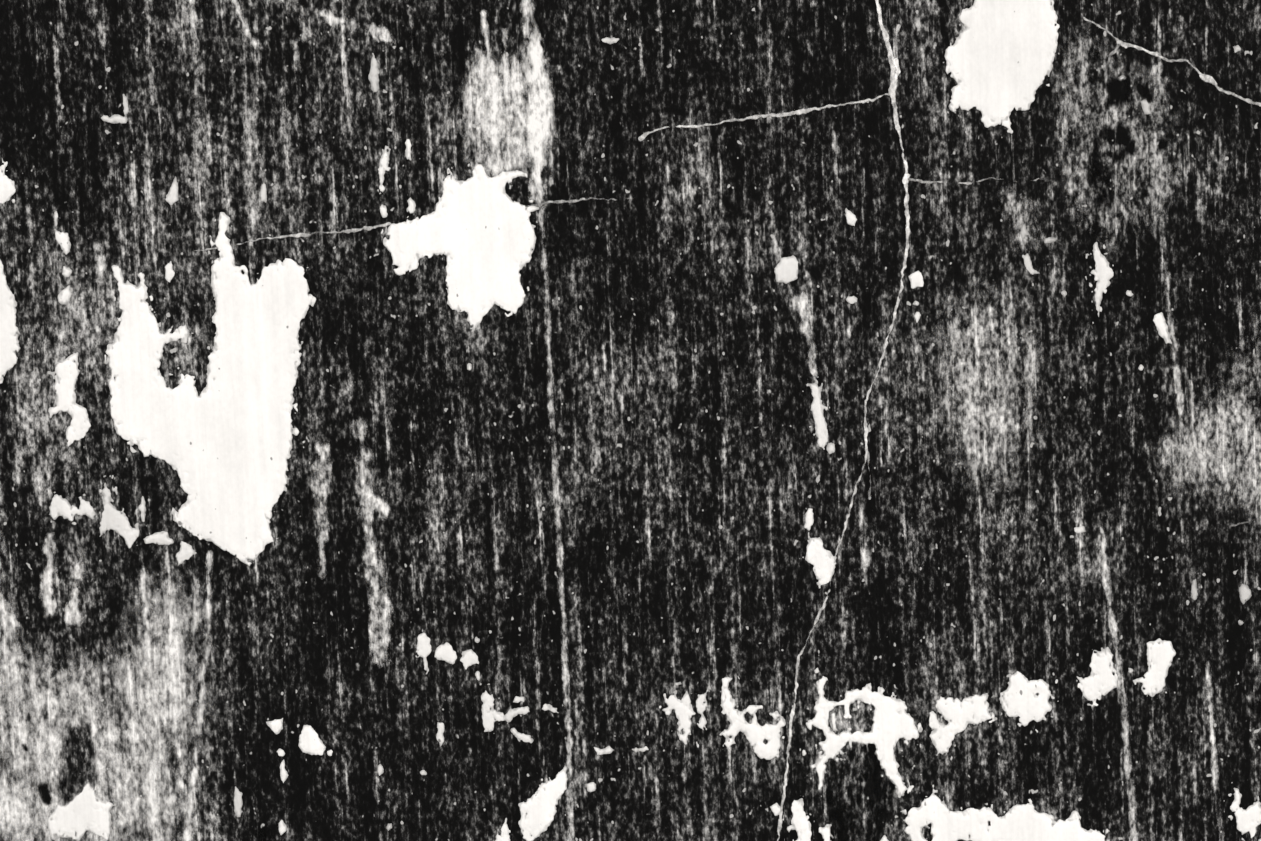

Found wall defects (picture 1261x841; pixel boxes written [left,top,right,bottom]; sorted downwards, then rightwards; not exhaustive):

peeling [944,0,1060,138]
crack [1083,17,1261,107]
peeling [378,139,539,332]
peeling [0,260,20,384]
peeling [48,203,316,566]
crack [638,0,998,841]
peeling [47,782,121,841]
peeling [495,766,596,841]
peeling [659,677,786,760]
peeling [770,798,834,841]
peeling [802,668,1110,841]
peeling [1077,638,1176,710]